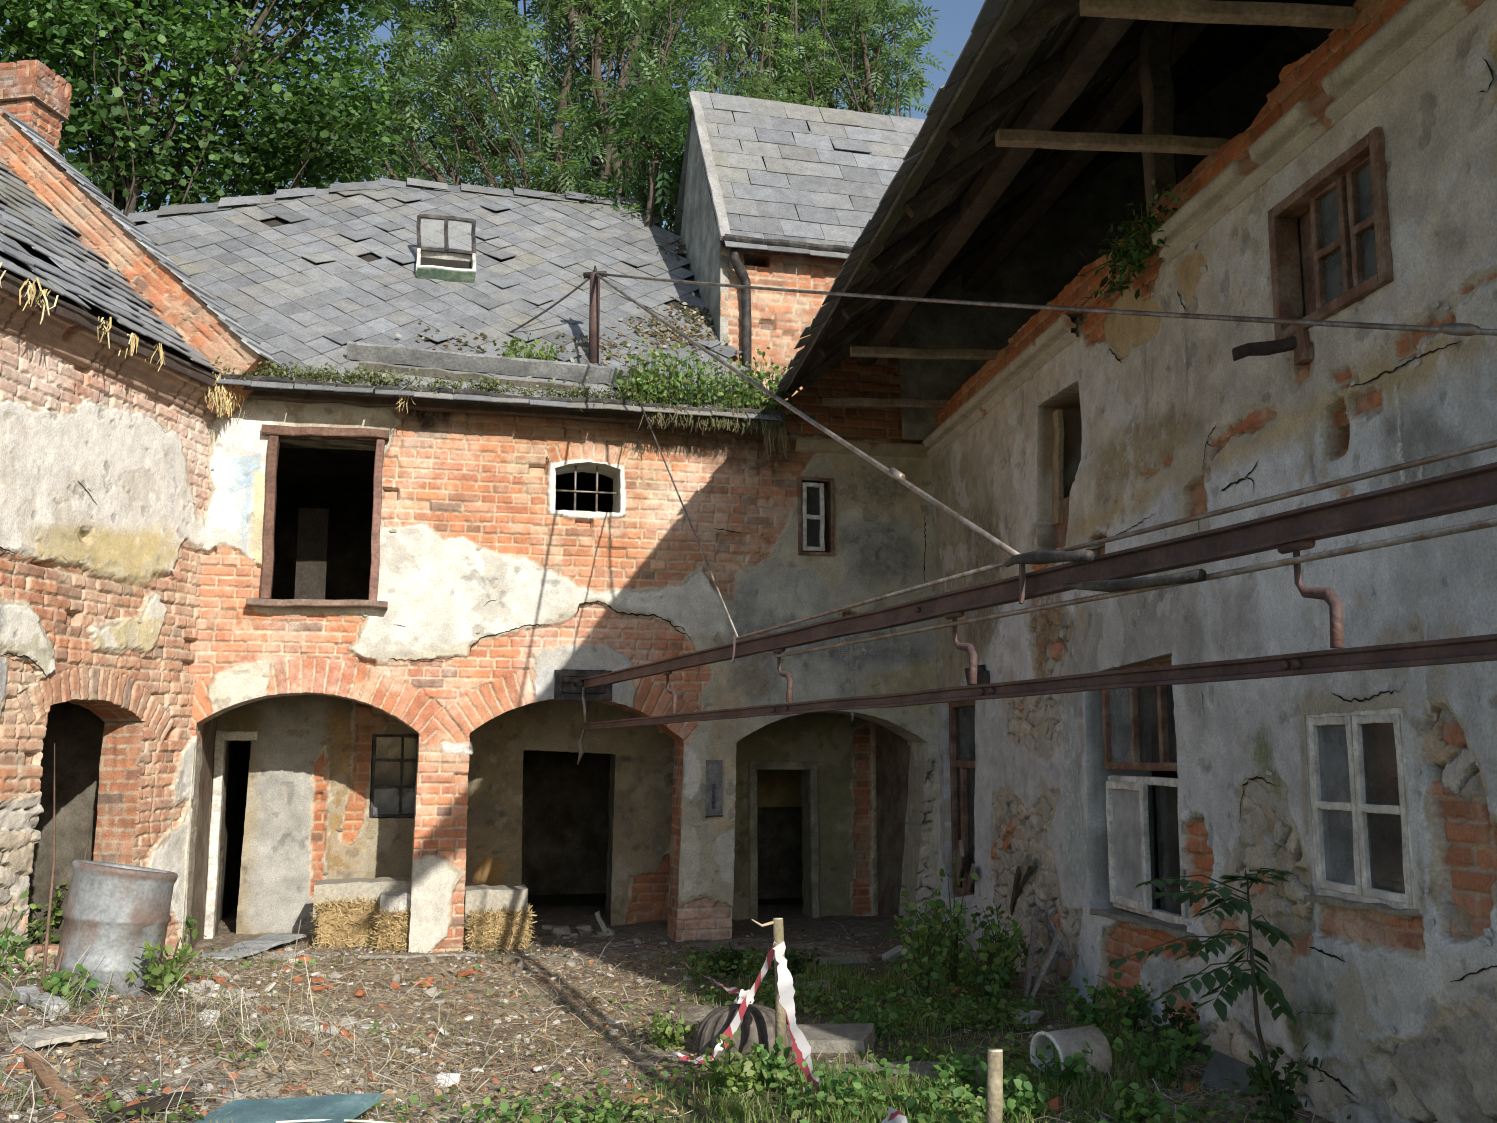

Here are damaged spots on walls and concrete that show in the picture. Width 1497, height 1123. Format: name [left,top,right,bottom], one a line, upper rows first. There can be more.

peeling [1472,18,1497,152]
spalling [937,0,1411,427]
crack [1198,423,1258,530]
spalling [1282,332,1391,501]
crack [1350,341,1462,387]
spalling [0,331,923,967]
crack [1332,690,1400,702]
spalling [987,592,1497,1123]
crack [1451,965,1497,982]